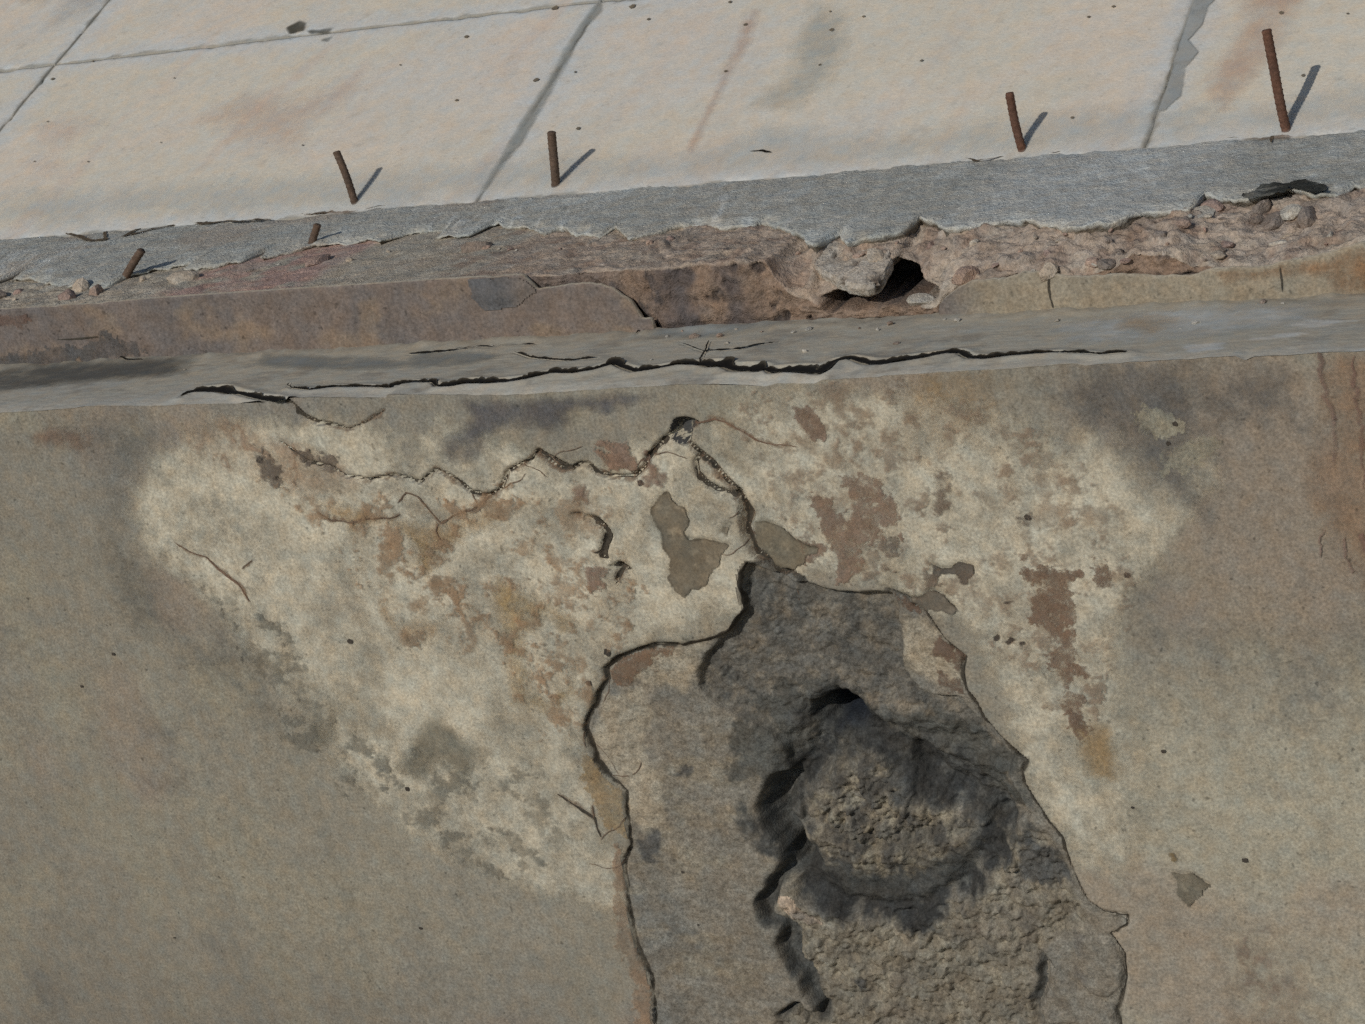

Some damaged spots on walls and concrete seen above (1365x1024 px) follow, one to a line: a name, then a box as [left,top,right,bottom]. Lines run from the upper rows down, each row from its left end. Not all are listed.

water stain [264,355,399,367]
spalling [501,5,600,160]
spalling [0,188,1365,328]
crack [175,330,1129,1024]
water stain [135,365,1215,913]
flaking render [585,521,1128,1024]